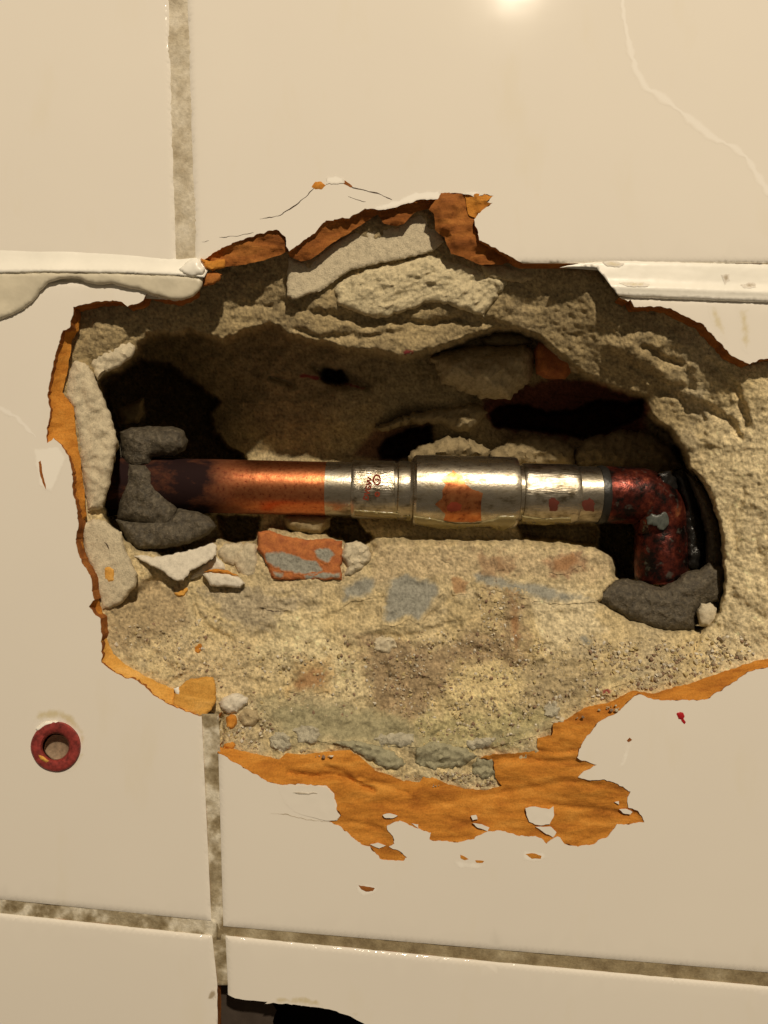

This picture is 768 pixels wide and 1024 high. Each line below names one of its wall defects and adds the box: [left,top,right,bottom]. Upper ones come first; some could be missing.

crack [205,180,392,242]
spalling [32,190,768,862]